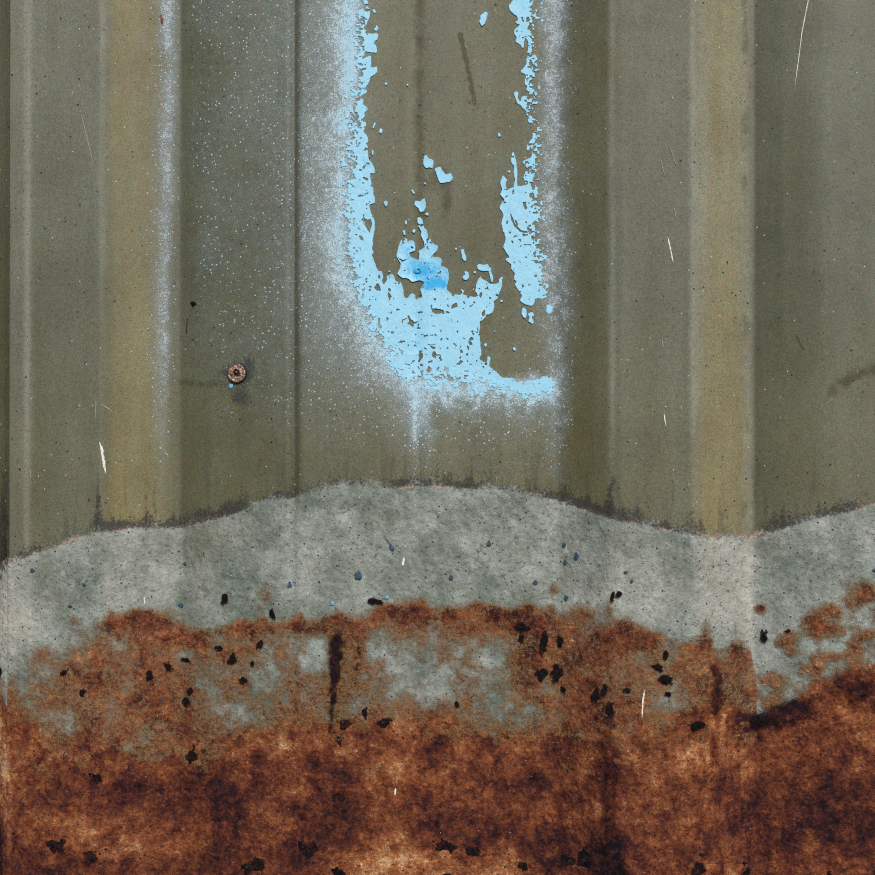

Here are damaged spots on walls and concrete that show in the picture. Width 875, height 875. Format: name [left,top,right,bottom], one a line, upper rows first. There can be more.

peeling [332,0,555,405]
peeling [214,645,237,665]
peeling [515,622,530,643]
peeling [539,631,563,657]
peeling [534,664,566,693]
peeling [649,651,673,697]
peeling [591,684,615,718]
rust [0,578,875,875]
peeling [688,721,706,733]